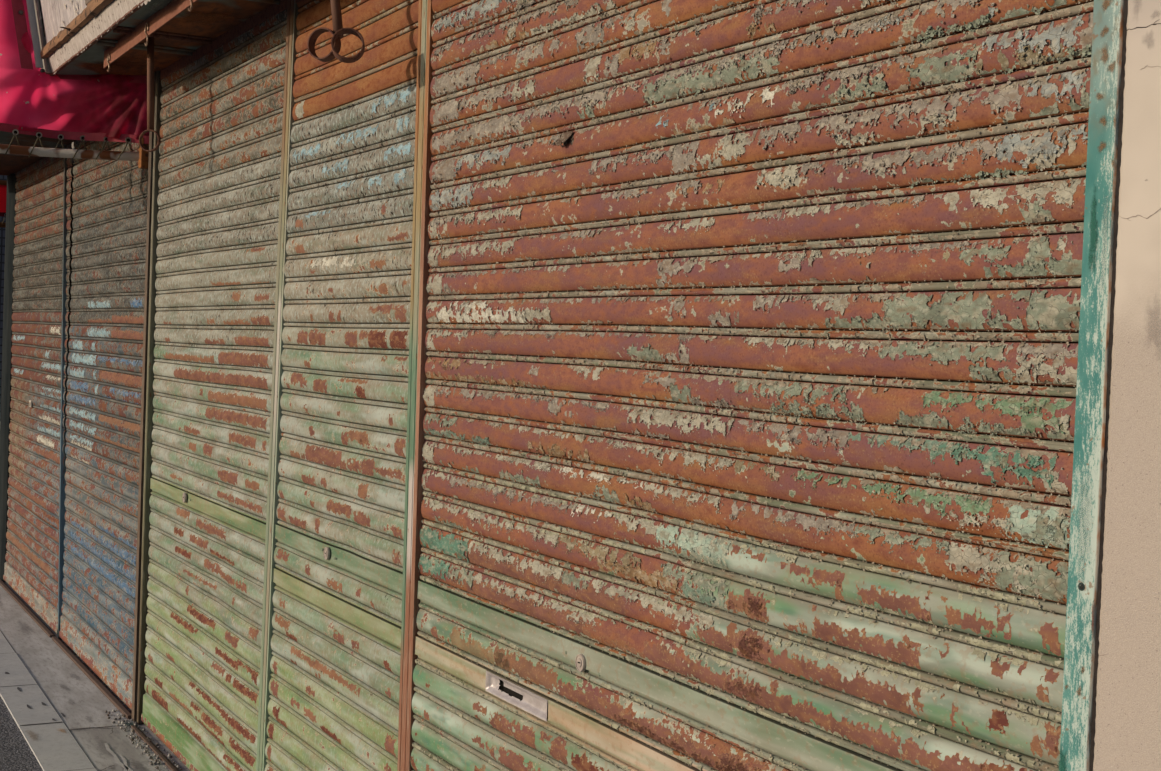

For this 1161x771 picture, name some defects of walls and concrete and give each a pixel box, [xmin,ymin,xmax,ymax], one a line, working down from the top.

peeling [292,86,412,192]
peeling [37,327,142,464]
peeling [88,300,111,308]
rust [163,281,270,451]
peeling [310,252,377,272]
peeling [414,0,1097,771]
rust [277,404,406,534]
rust [146,507,362,771]
rust [449,546,626,635]
rust [430,626,786,771]
rust [643,588,1033,771]
rust [731,544,1014,640]